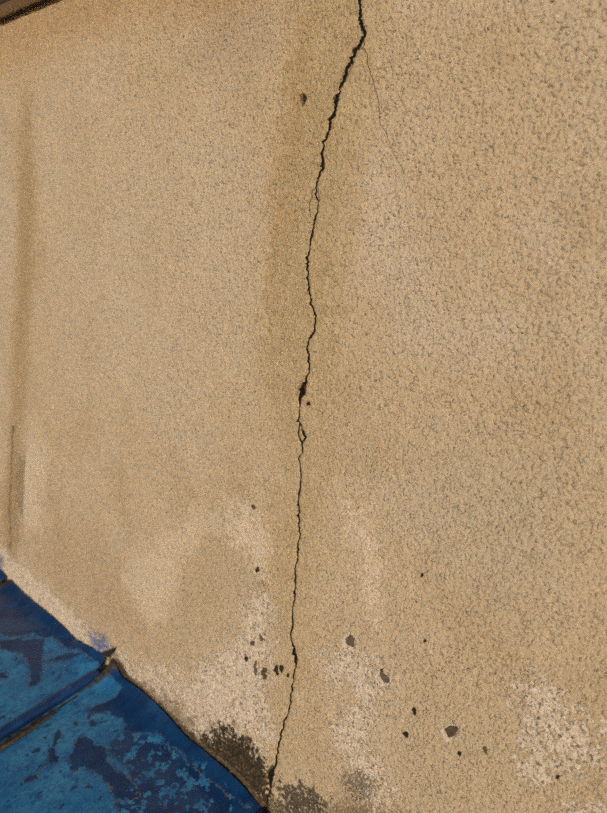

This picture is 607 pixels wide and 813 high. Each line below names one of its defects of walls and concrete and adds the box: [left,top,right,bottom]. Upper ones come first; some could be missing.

leakage [131,677,410,813]
crack [265,0,402,812]